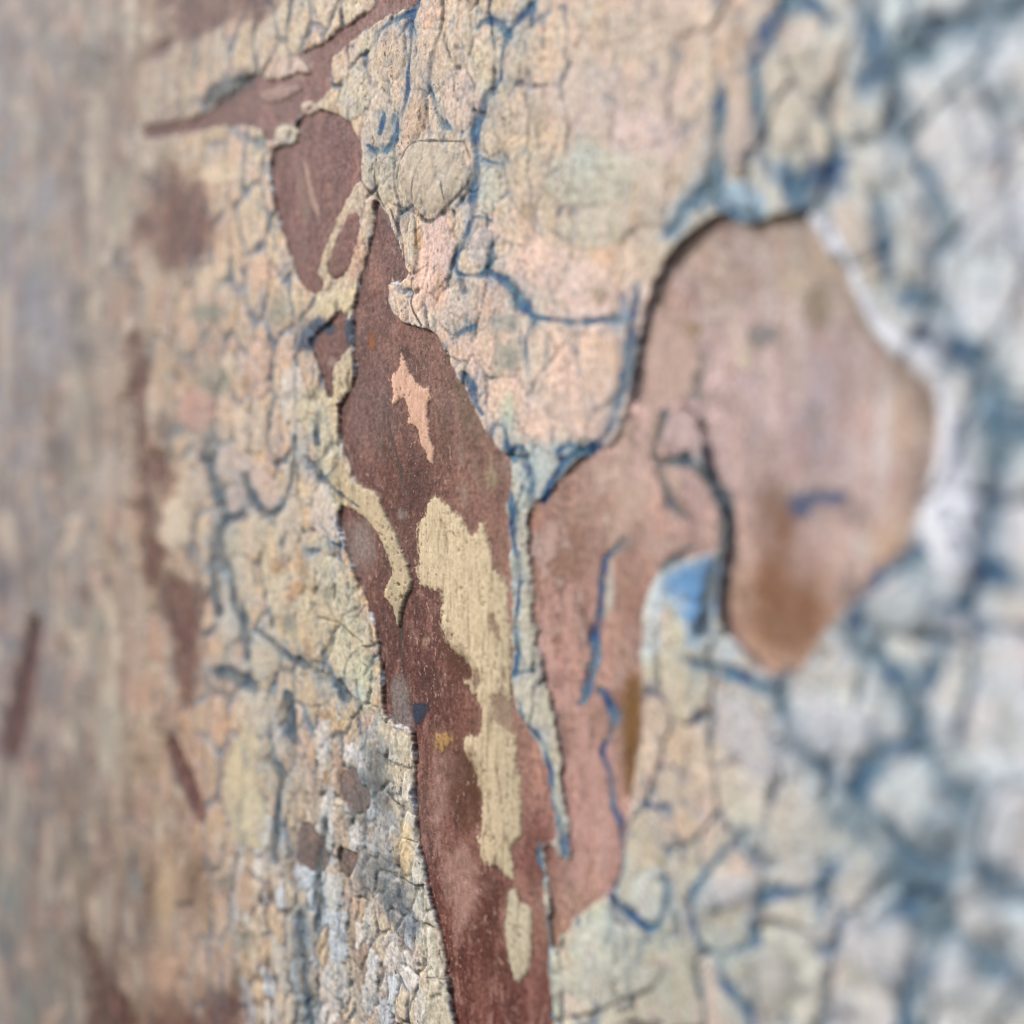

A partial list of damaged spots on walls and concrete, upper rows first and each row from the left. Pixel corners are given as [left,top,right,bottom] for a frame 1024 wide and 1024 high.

peeling [145,0,419,294]
crack [361,0,639,677]
crack [664,0,846,238]
crack [871,198,990,372]
crack [854,0,1024,252]
crack [200,426,403,864]
crack [296,818,329,1024]
crack [518,703,568,886]
crack [578,546,671,834]
peeling [298,201,982,1024]
crack [609,828,839,952]
crack [652,388,1024,1024]